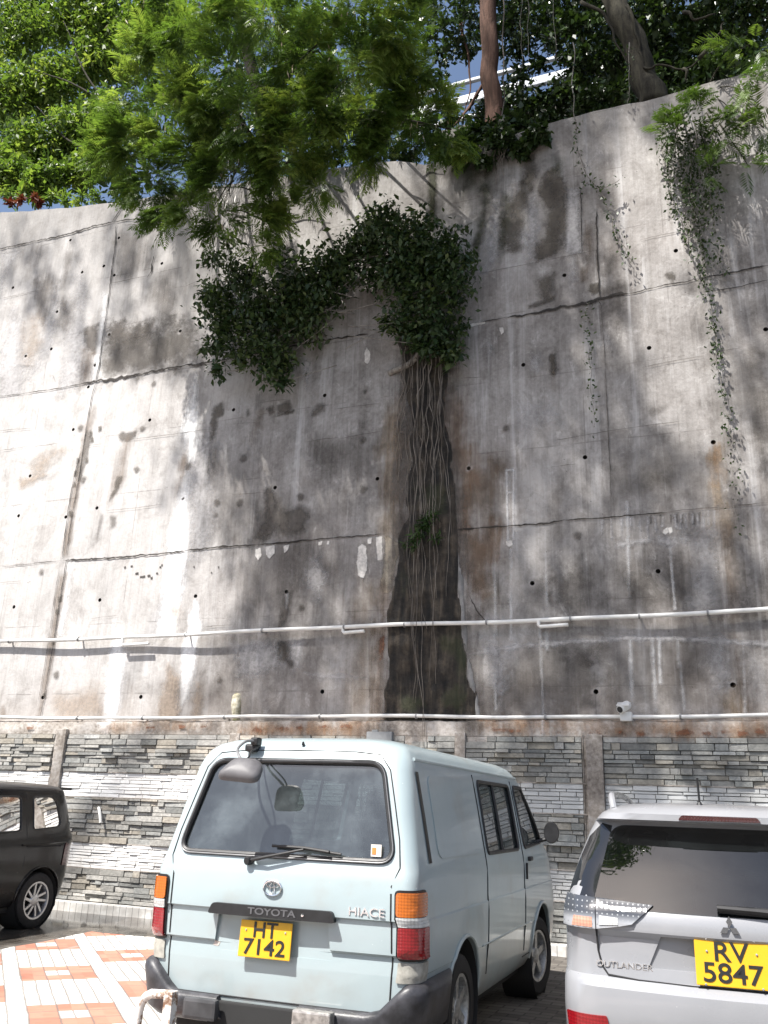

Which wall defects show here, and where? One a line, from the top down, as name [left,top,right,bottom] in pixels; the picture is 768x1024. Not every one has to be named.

leakage [473,149,582,263]
leakage [529,272,555,307]
leakage [268,402,294,415]
leakage [258,488,309,539]
spalling [255,545,289,560]
spalling [356,536,398,593]
corrosion [665,727,725,736]